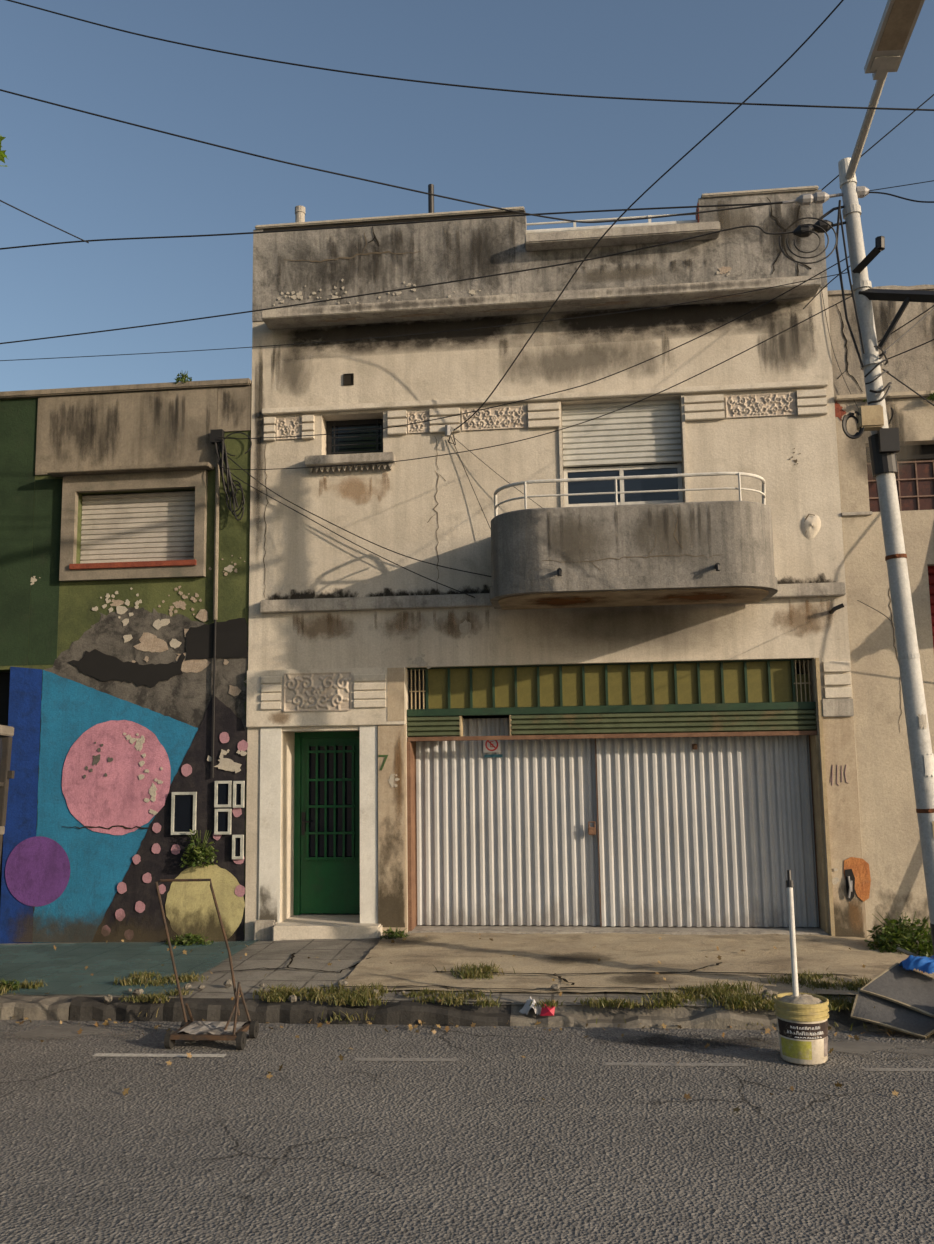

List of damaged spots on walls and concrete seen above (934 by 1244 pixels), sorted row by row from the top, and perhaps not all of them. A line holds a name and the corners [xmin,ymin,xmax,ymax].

crack [767,197,812,276]
peeling [273,279,363,322]
leakage [520,301,807,378]
crack [427,437,446,592]
corrosion [535,597,594,606]
corrosion [660,592,735,602]
flaking render [42,586,248,779]